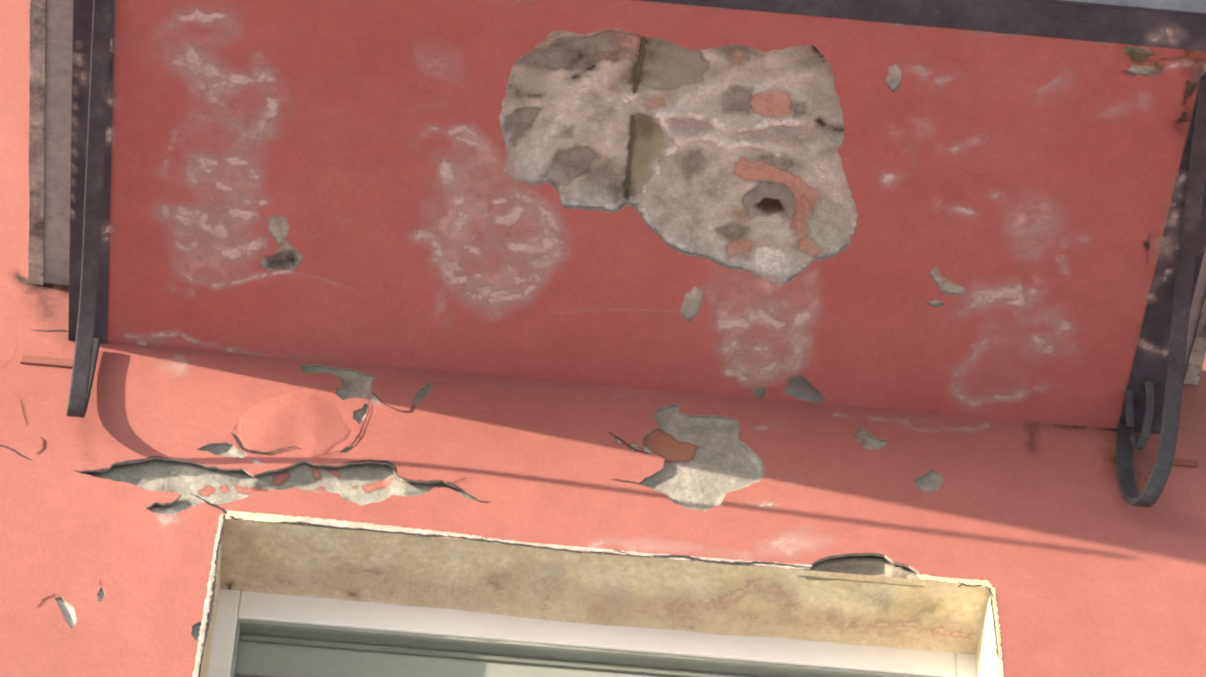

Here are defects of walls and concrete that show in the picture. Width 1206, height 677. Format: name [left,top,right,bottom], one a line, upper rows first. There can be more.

damp [170,9,235,30]
damp [172,46,274,123]
damp [161,97,292,288]
spalling [260,215,303,269]
damp [413,125,563,319]
spalling [500,28,857,284]
damp [707,271,820,384]
flaking render [300,366,380,425]
crack [231,393,490,502]
flaking render [616,405,765,511]
crack [74,456,811,661]
flaking render [81,444,1004,677]